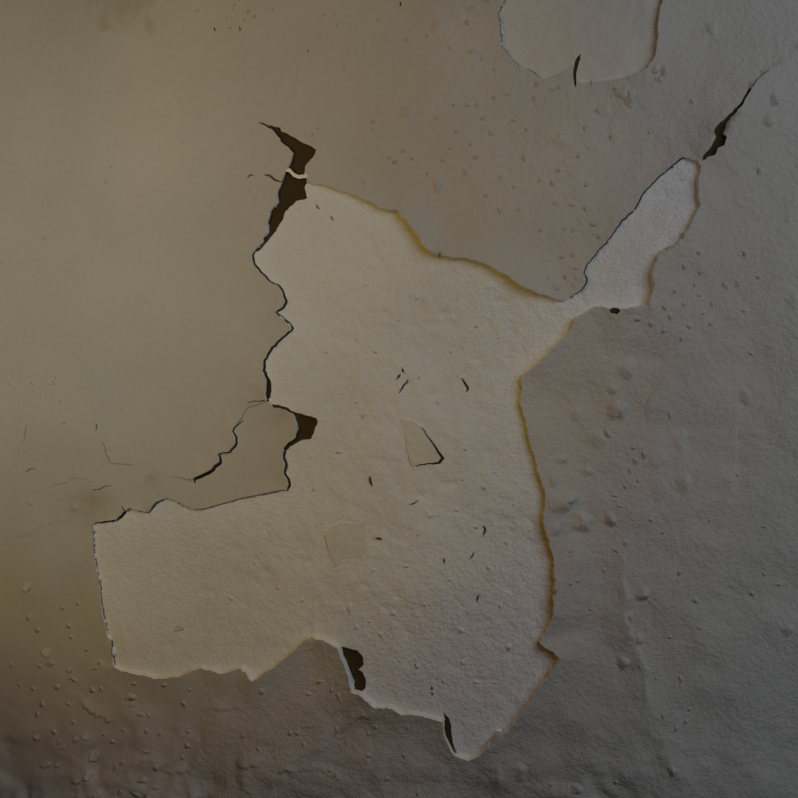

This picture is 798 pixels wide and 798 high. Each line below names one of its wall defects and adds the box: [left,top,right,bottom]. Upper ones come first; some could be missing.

peeling [499,0,661,82]
crack [703,74,764,160]
crack [571,158,683,297]
crack [194,122,333,510]
peeling [94,158,699,756]